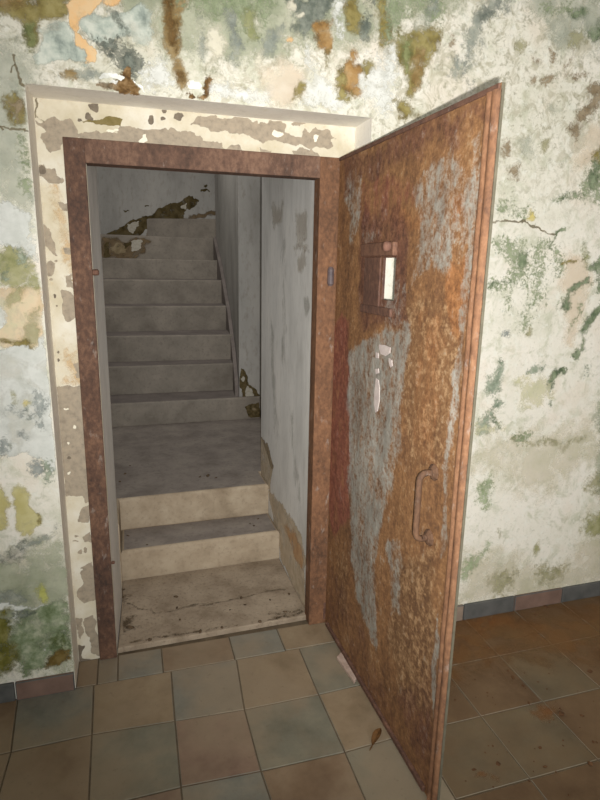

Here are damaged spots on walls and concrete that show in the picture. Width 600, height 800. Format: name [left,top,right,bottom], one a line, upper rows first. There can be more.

water stain [0,0,70,47]
water stain [93,0,460,120]
water stain [0,48,34,205]
peeling [35,103,334,156]
water stain [553,73,600,203]
peeling [0,201,71,281]
spalling [101,196,216,258]
crack [493,219,566,248]
water stain [561,249,600,360]
peeling [0,286,92,554]
water stain [0,486,74,678]
spalling [77,562,96,603]